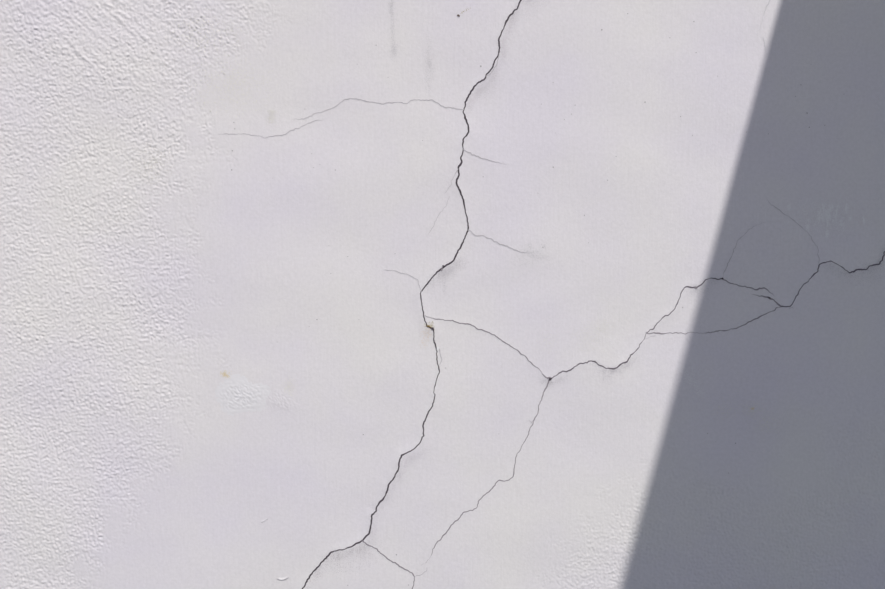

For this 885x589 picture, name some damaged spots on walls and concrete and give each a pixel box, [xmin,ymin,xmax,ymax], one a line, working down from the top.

crack [225,0,885,589]